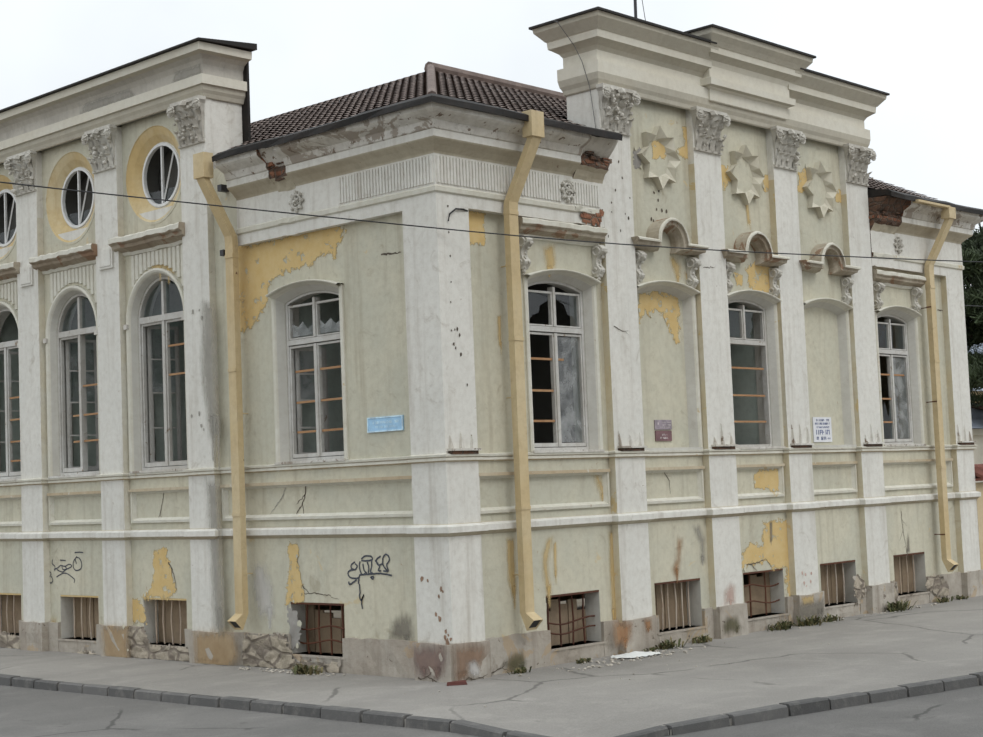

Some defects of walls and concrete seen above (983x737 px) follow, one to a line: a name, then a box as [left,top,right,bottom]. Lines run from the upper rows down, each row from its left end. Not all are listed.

peeling [238,225,347,332]
peeling [638,291,681,344]
spalling [127,547,189,661]
spalling [240,543,341,673]
peeling [741,518,790,597]